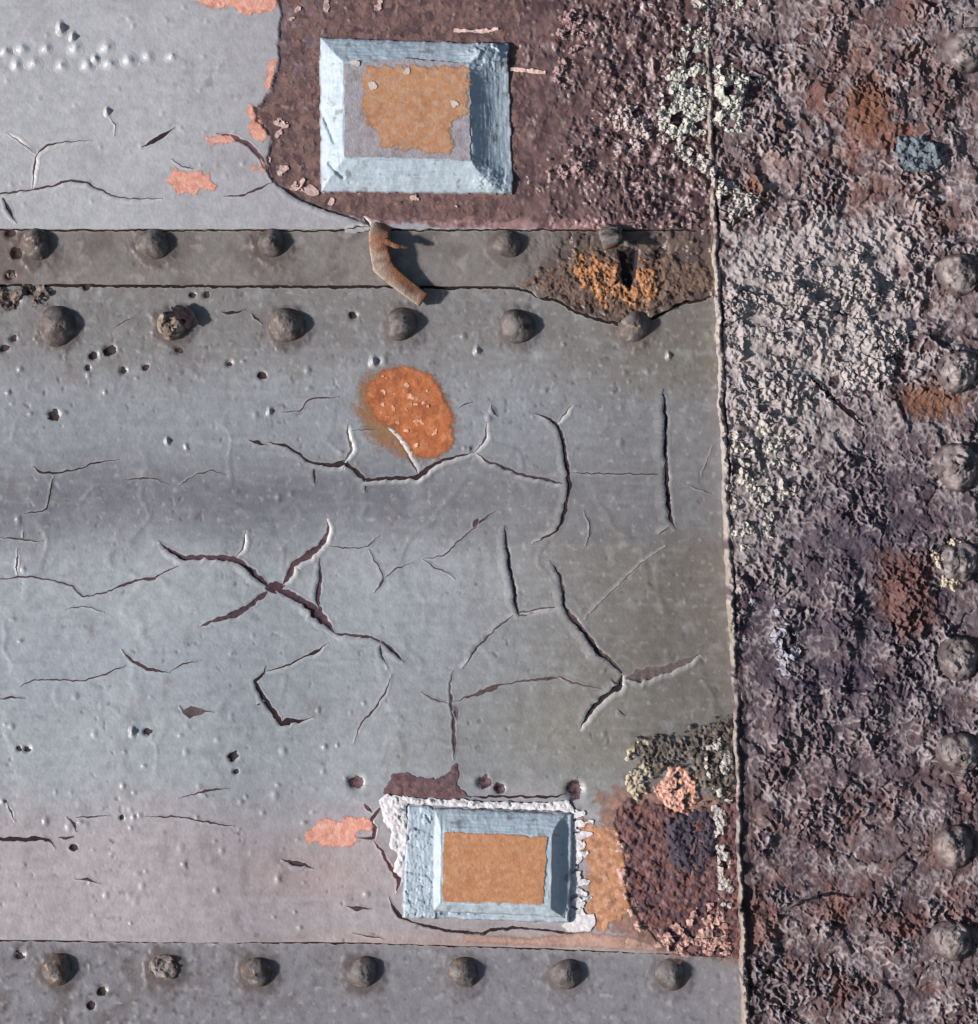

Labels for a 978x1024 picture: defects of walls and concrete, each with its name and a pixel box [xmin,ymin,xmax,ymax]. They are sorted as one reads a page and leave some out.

rust [850,87,888,142]
peeling [166,168,217,195]
crack [0,126,696,234]
rust [356,366,454,458]
rust [902,385,968,418]
crack [0,388,714,760]
rust [877,553,940,643]
peeling [304,763,581,882]
rust [463,782,741,967]